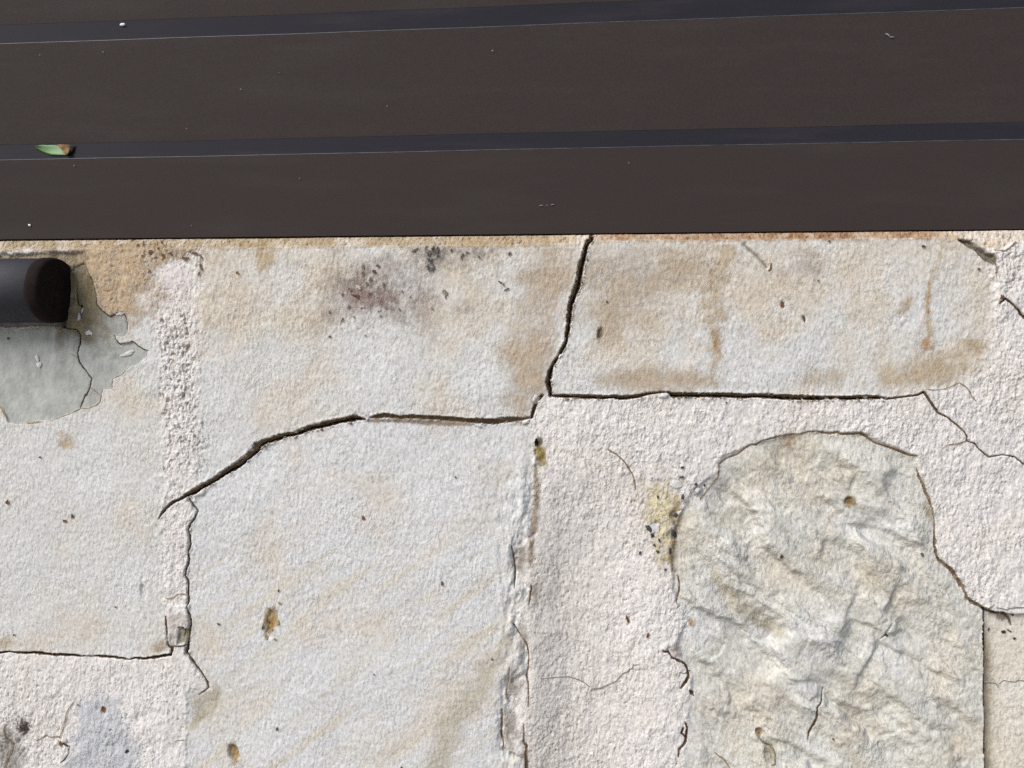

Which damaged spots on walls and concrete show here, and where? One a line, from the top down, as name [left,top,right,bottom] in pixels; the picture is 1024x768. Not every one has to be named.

peeling [0,251,149,424]
water stain [329,263,433,323]
water stain [610,368,712,388]
crack [0,235,1024,696]
crack [700,431,1024,753]